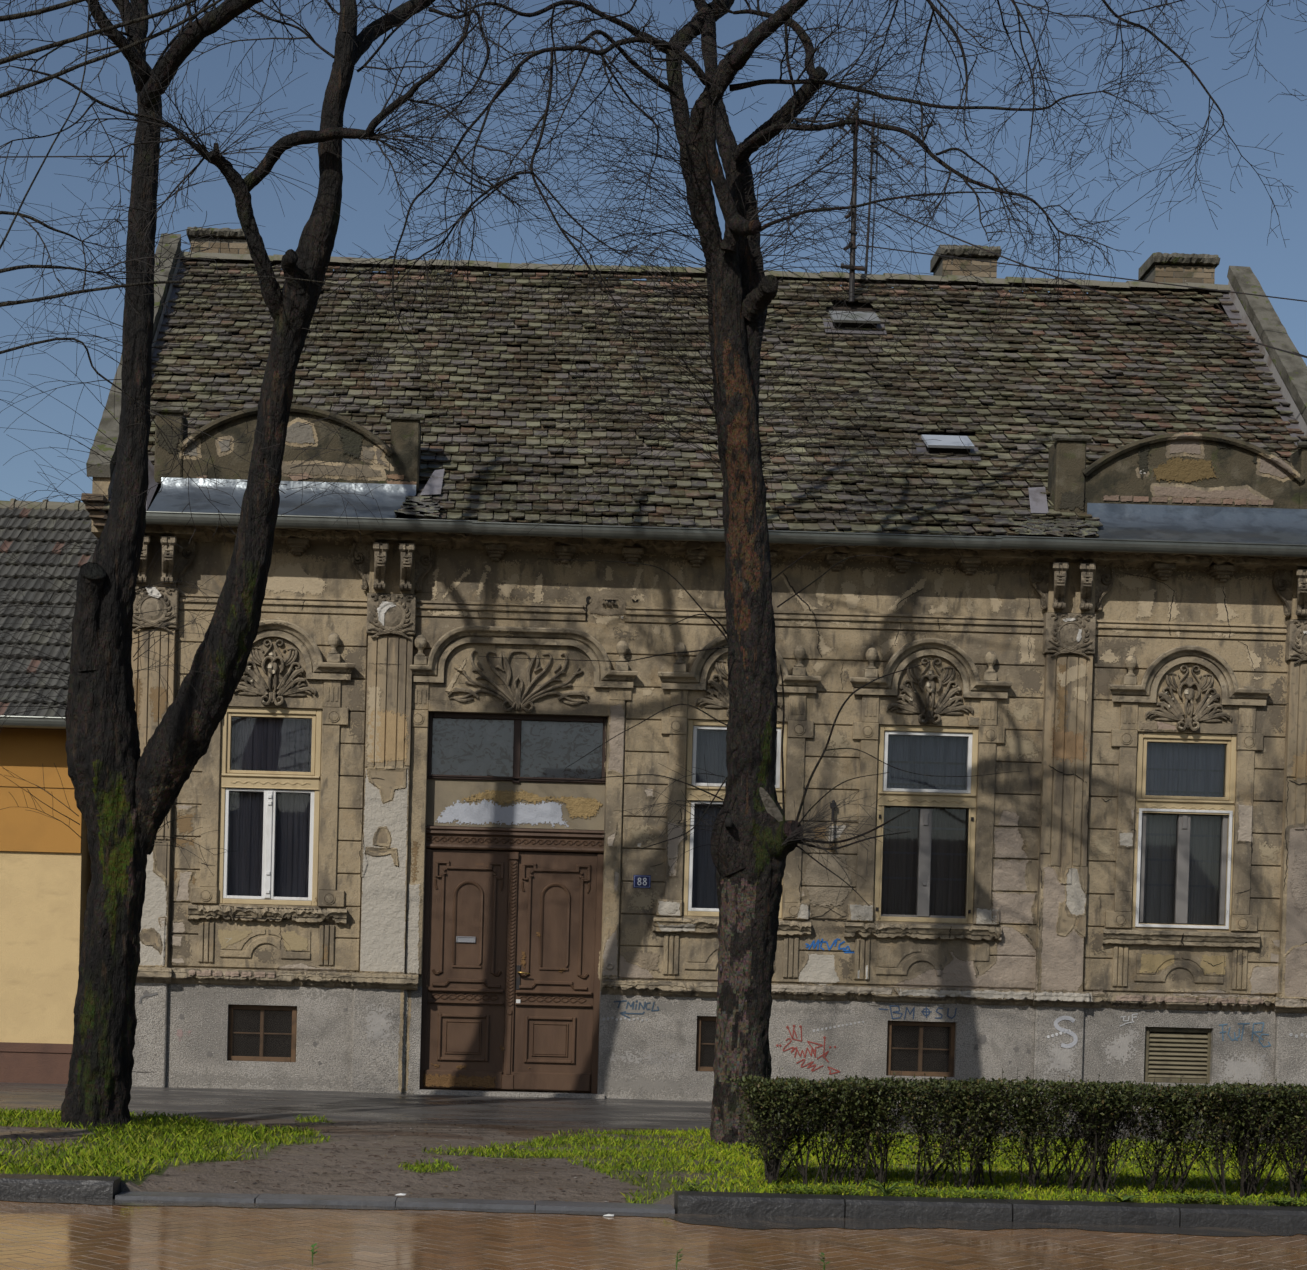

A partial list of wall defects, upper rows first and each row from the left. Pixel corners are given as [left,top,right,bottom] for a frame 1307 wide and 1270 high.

flaking render [179,435,234,460]
flaking render [282,417,417,485]
flaking render [1103,453,1300,505]
peeling [428,565,519,617]
peeling [532,572,544,604]
peeling [779,569,895,672]
flaking render [1137,690,1198,734]
peeling [435,799,569,828]
spalling [138,685,497,1093]
flaking render [603,817,700,935]
flaking render [771,793,1307,1011]
flaking render [597,922,658,984]